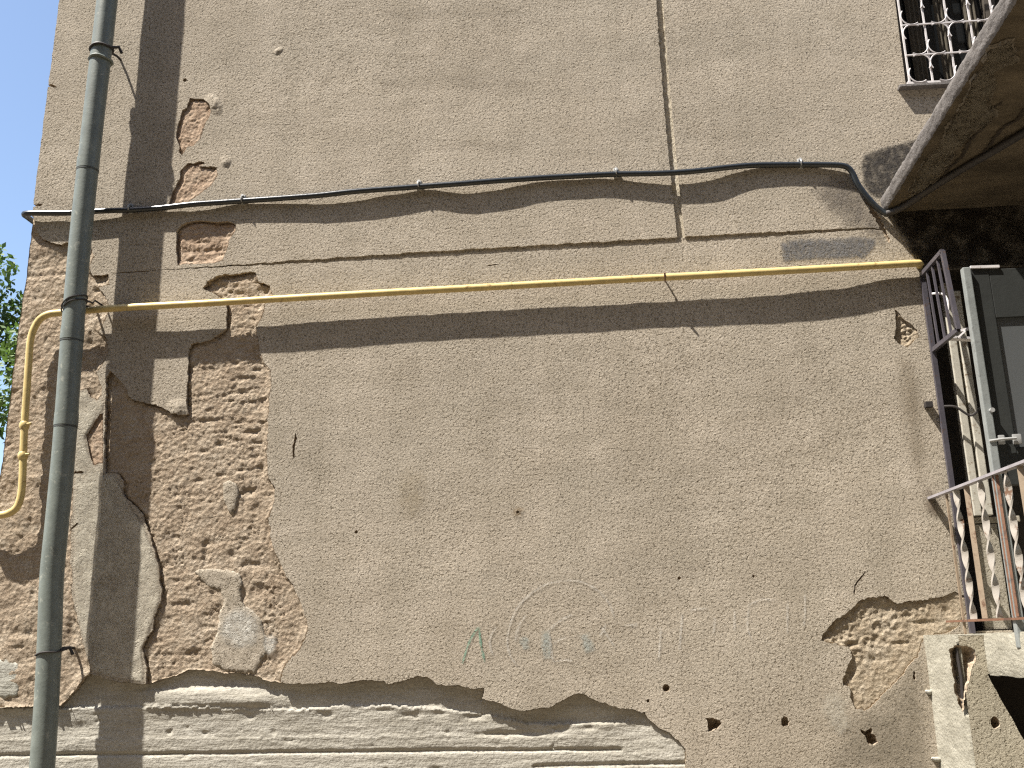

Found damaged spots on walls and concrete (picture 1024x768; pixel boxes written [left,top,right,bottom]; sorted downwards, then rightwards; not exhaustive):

spalling [169,98,218,204]
spalling [894,309,919,347]
spalling [0,217,68,768]
spalling [55,220,686,768]
spalling [820,591,967,711]
spalling [949,645,976,713]